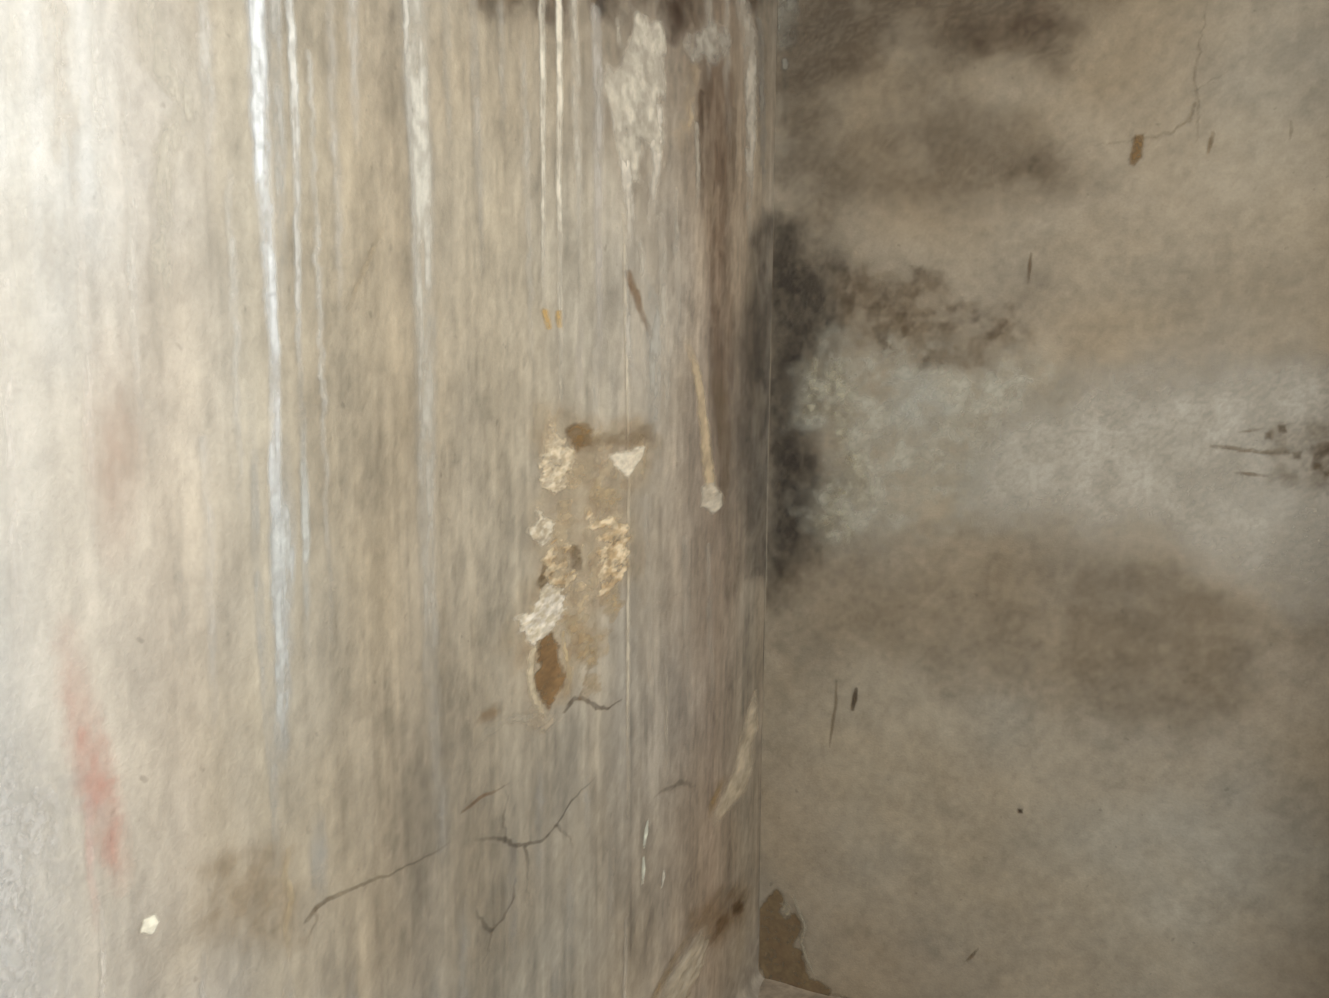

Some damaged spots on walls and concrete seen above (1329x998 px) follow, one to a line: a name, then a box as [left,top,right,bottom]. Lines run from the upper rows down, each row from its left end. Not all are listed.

water stain [267,228,279,357]
water stain [249,0,301,310]
water stain [403,0,433,436]
water stain [525,0,602,257]
water stain [740,0,901,185]
water stain [751,223,1329,582]
water stain [269,400,309,725]
peeling [518,419,646,731]
flaking render [759,889,831,996]